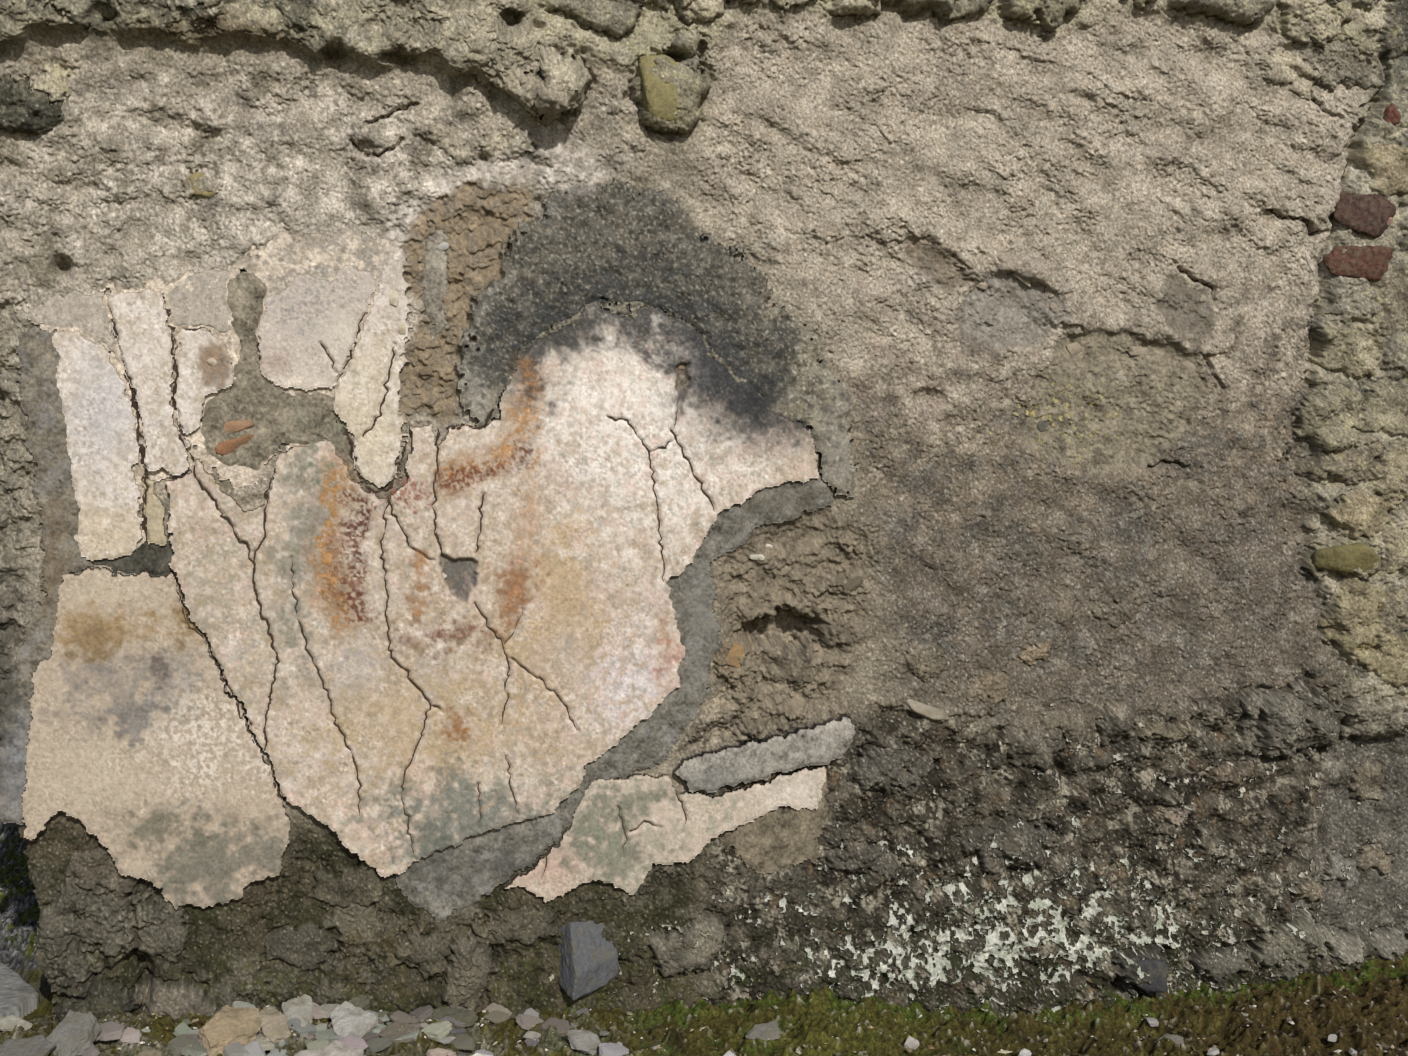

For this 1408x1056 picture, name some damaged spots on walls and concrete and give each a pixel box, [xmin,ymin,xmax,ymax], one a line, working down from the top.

spalling [389,182,531,421]
leakage [462,242,803,434]
spalling [676,364,689,398]
crack [108,296,365,816]
crack [340,348,500,855]
spalling [442,555,476,598]
crack [474,603,578,829]
crack [607,414,714,582]
spalling [725,643,823,692]
spalling [740,538,864,620]
crack [542,837,555,878]
crack [617,793,687,853]